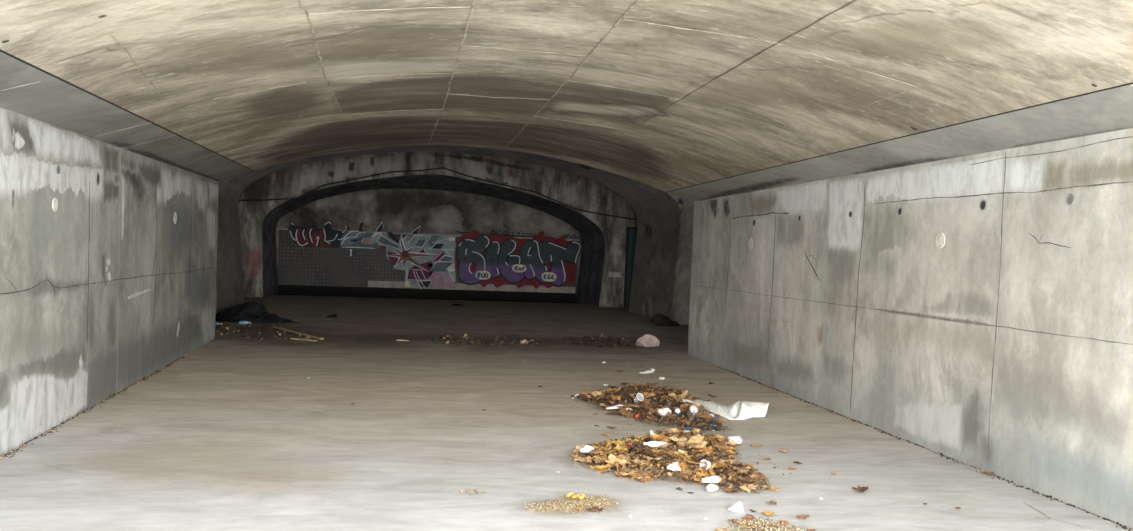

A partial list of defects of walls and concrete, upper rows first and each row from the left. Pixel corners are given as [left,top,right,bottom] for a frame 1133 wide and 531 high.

crack [0,229,210,322]
water stain [0,82,220,409]
crack [701,136,1133,453]